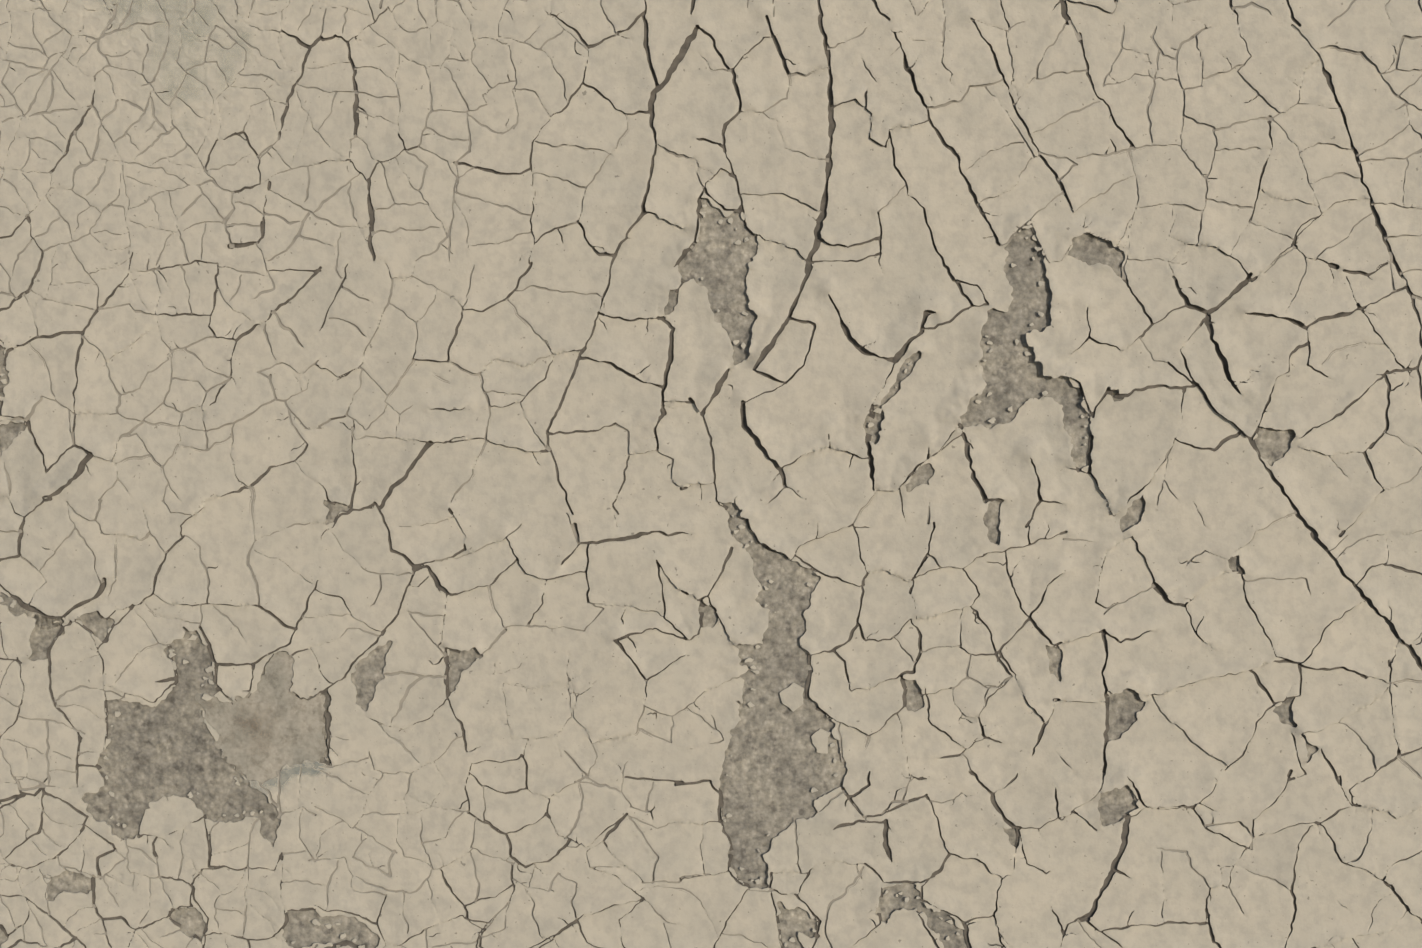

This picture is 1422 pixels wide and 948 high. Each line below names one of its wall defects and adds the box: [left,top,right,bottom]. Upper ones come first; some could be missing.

peeling [0,530,483,948]
crack [0,0,1097,948]
peeling [587,100,1319,948]
crack [872,0,1422,948]